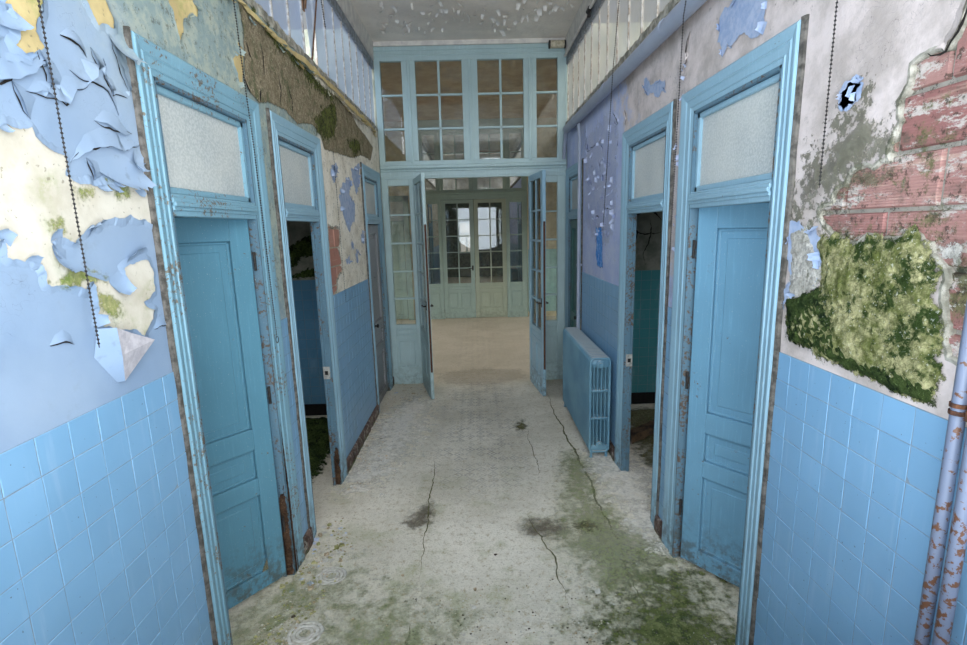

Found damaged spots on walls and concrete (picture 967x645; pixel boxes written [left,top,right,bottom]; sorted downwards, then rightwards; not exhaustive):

peeling [0,0,49,62]
peeling [80,0,147,65]
peeling [380,0,573,37]
peeling [716,0,767,58]
peeling [0,114,158,382]
spalling [328,163,365,295]
spalling [782,0,967,366]
crack [420,462,435,574]
crack [550,399,611,527]